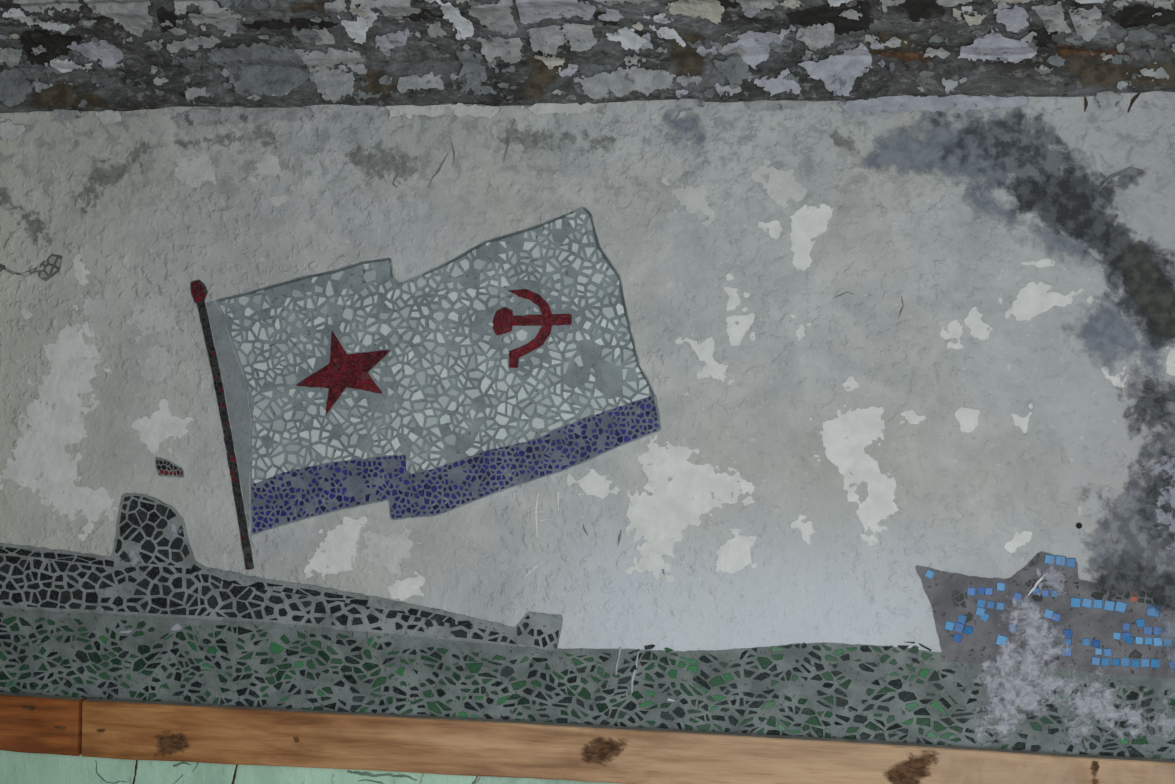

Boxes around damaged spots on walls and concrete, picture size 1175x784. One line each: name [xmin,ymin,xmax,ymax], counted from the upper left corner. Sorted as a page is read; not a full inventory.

peeling [0,0,1175,129]
peeling [747,159,833,271]
peeling [998,282,1093,321]
peeling [675,273,755,385]
peeling [940,306,993,350]
peeling [1101,339,1175,388]
peeling [955,407,980,433]
peeling [810,376,899,546]
peeling [565,435,757,582]
crack [95,760,138,784]
crack [173,762,199,784]
peeling [0,750,620,784]